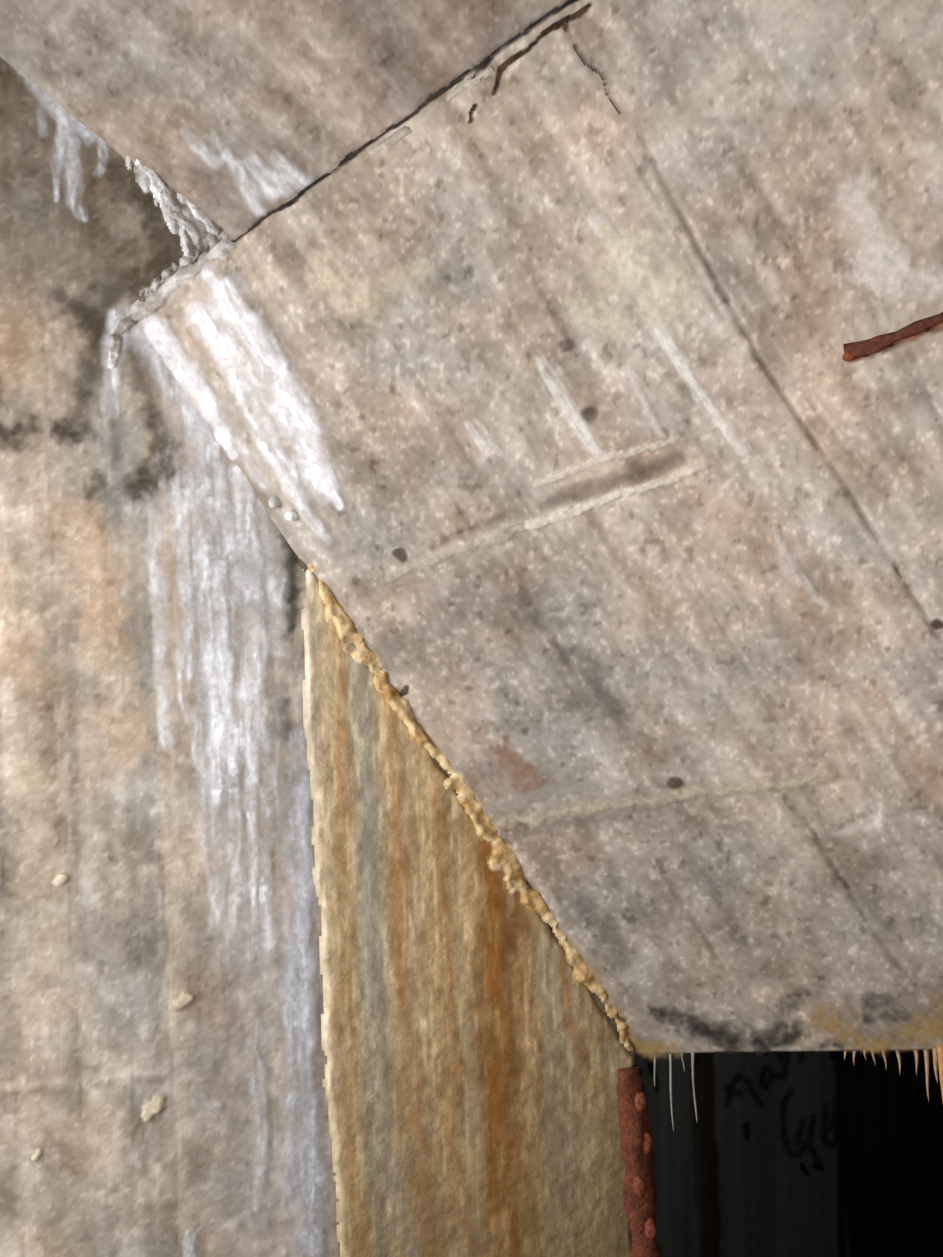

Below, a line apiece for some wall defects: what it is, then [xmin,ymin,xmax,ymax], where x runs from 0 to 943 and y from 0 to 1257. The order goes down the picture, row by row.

leakage [33,84,106,221]
crack [231,0,620,243]
leakage [0,423,21,442]
leakage [107,147,343,923]
leakage [285,776,315,1073]
leakage [287,1094,325,1256]
rust [481,839,529,1201]
rust [635,1092,646,1113]
rust [643,1132,653,1154]
rust [645,1218,656,1239]
leakage [752,1028,800,1053]